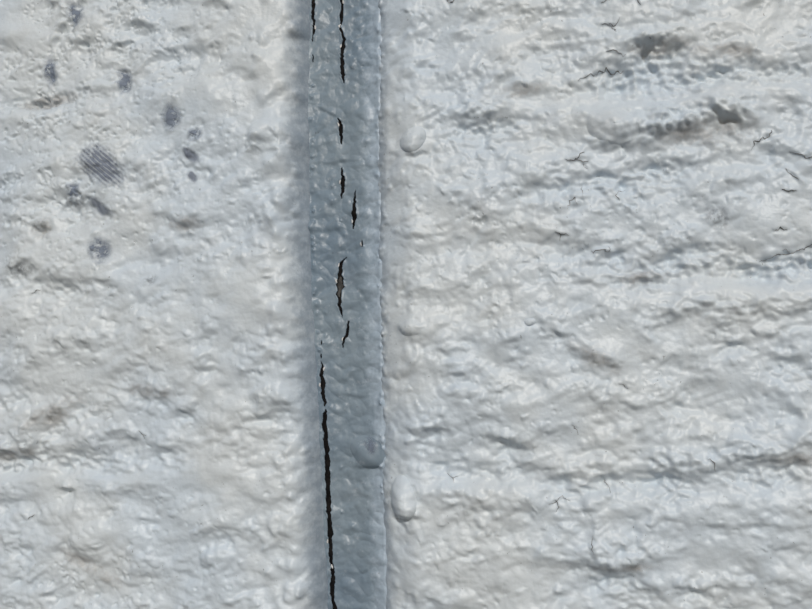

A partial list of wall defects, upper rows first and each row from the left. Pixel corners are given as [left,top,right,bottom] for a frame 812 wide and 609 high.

crack [309,0,317,62]
crack [338,0,346,83]
crack [578,18,626,81]
crack [336,119,344,144]
crack [335,168,363,347]
crack [319,341,337,609]